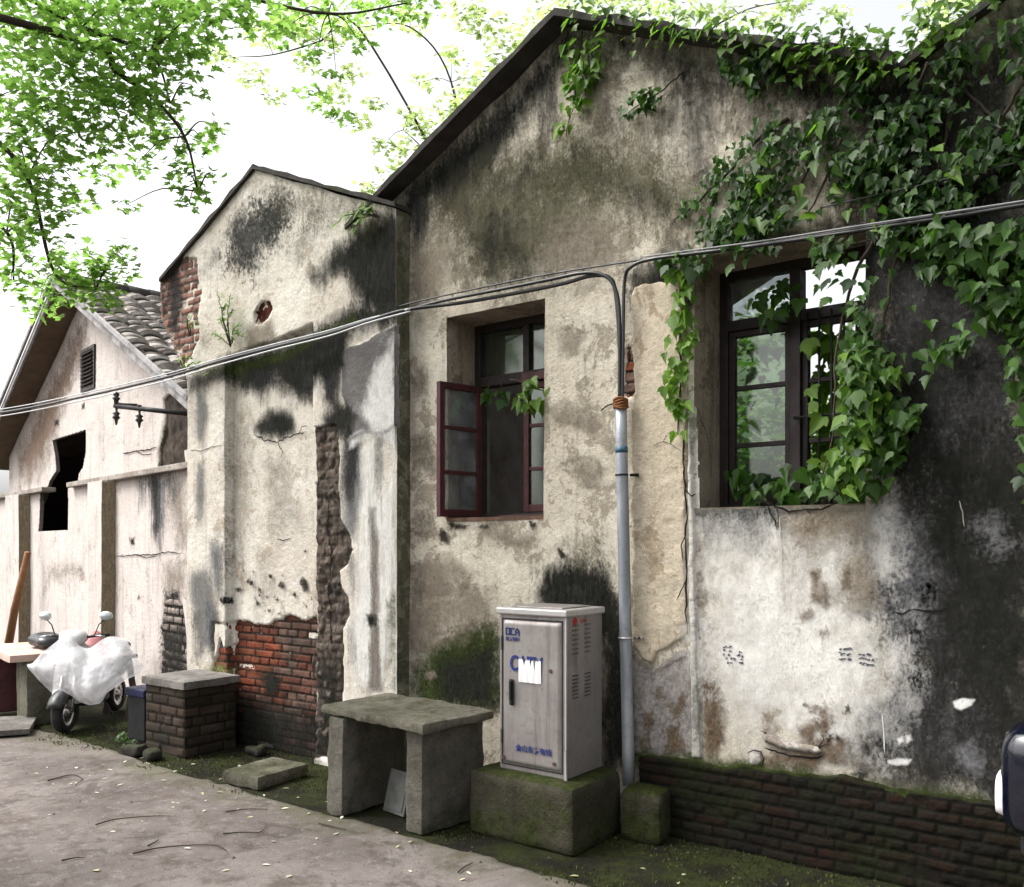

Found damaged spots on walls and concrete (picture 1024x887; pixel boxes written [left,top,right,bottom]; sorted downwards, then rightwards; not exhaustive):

flaking render [160,256,202,369]
spalling [255,301,273,325]
water stain [189,0,1024,802]
flaking render [158,597,187,674]
water stain [164,543,221,651]
flaking render [213,426,353,759]
crack [753,500,840,615]
corrosion [800,569,829,619]